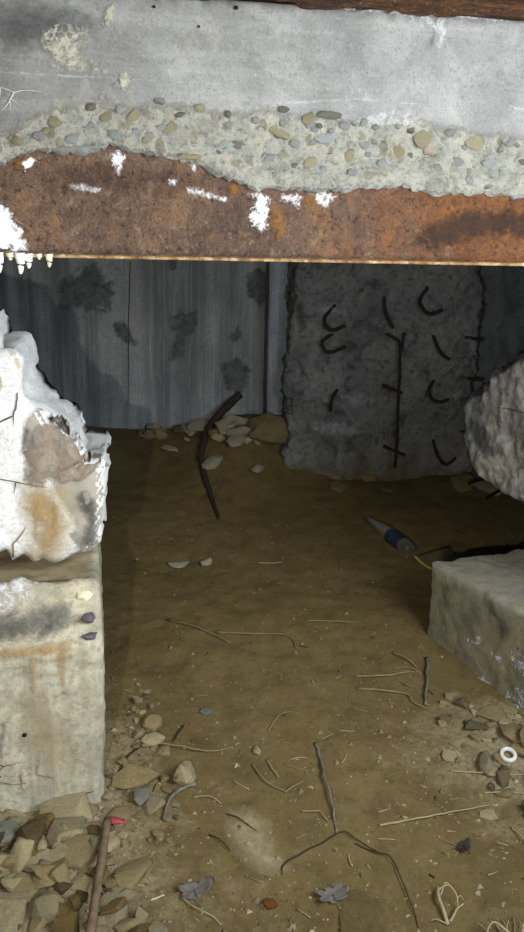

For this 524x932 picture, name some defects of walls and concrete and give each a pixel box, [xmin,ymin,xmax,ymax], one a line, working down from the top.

crack [0,87,40,111]
efflorescence [111,152,125,174]
efflorescence [249,191,271,230]
efflorescence [317,192,336,207]
efflorescence [0,205,53,274]
peeling [113,323,135,344]
spalling [382,296,406,469]
crack [0,393,18,424]
spalling [24,414,102,504]
crack [12,527,26,557]
leakage [0,577,36,612]
leakage [0,611,67,639]